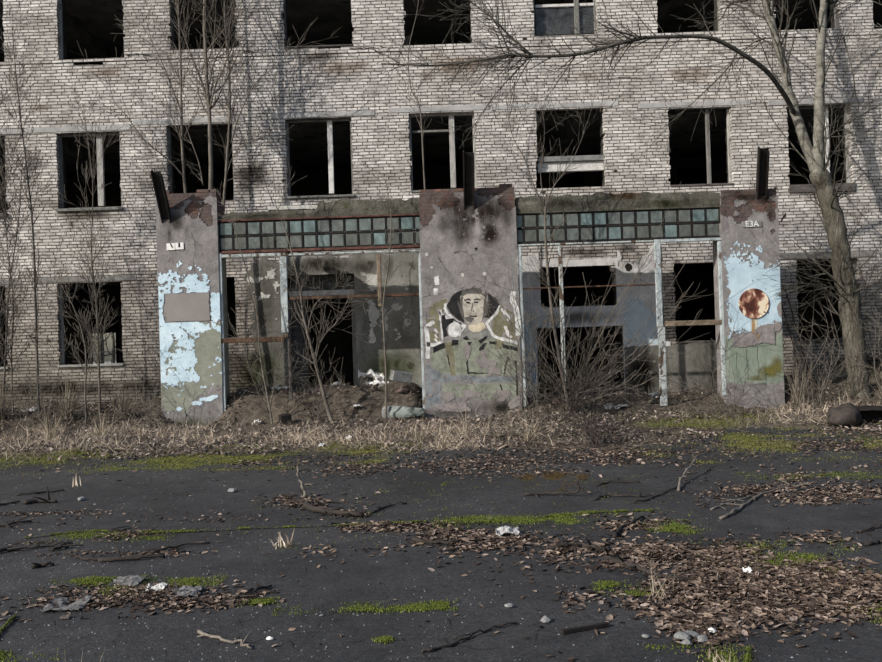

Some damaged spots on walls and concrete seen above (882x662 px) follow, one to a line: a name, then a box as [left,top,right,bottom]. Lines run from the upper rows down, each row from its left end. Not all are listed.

flaking render [167,192,216,226]
flaking render [420,188,463,228]
water stain [453,201,502,242]
flaking render [475,187,515,211]
flaking render [721,188,786,235]
peeling [361,271,411,344]
peeling [723,241,784,386]
peeling [158,261,222,414]